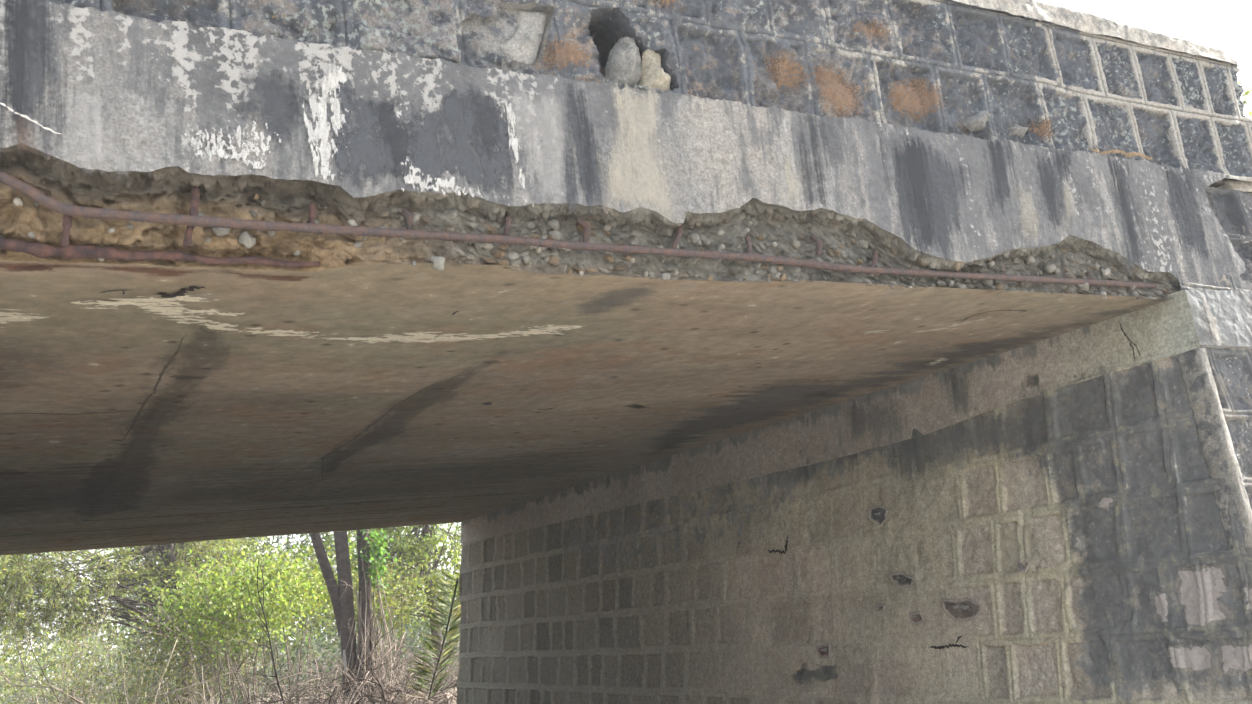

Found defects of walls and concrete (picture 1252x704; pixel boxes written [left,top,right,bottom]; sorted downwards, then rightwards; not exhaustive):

leakage [0,0,65,143]
leakage [238,77,308,141]
leakage [331,79,514,192]
spalling [0,63,1181,300]
leakage [882,142,970,258]
leakage [988,138,1014,212]
leakage [1037,146,1071,225]
leakage [1109,159,1143,271]
corrosion [104,267,194,276]
corrosion [234,273,306,281]
crack [2,334,187,441]
spalling [941,598,982,622]